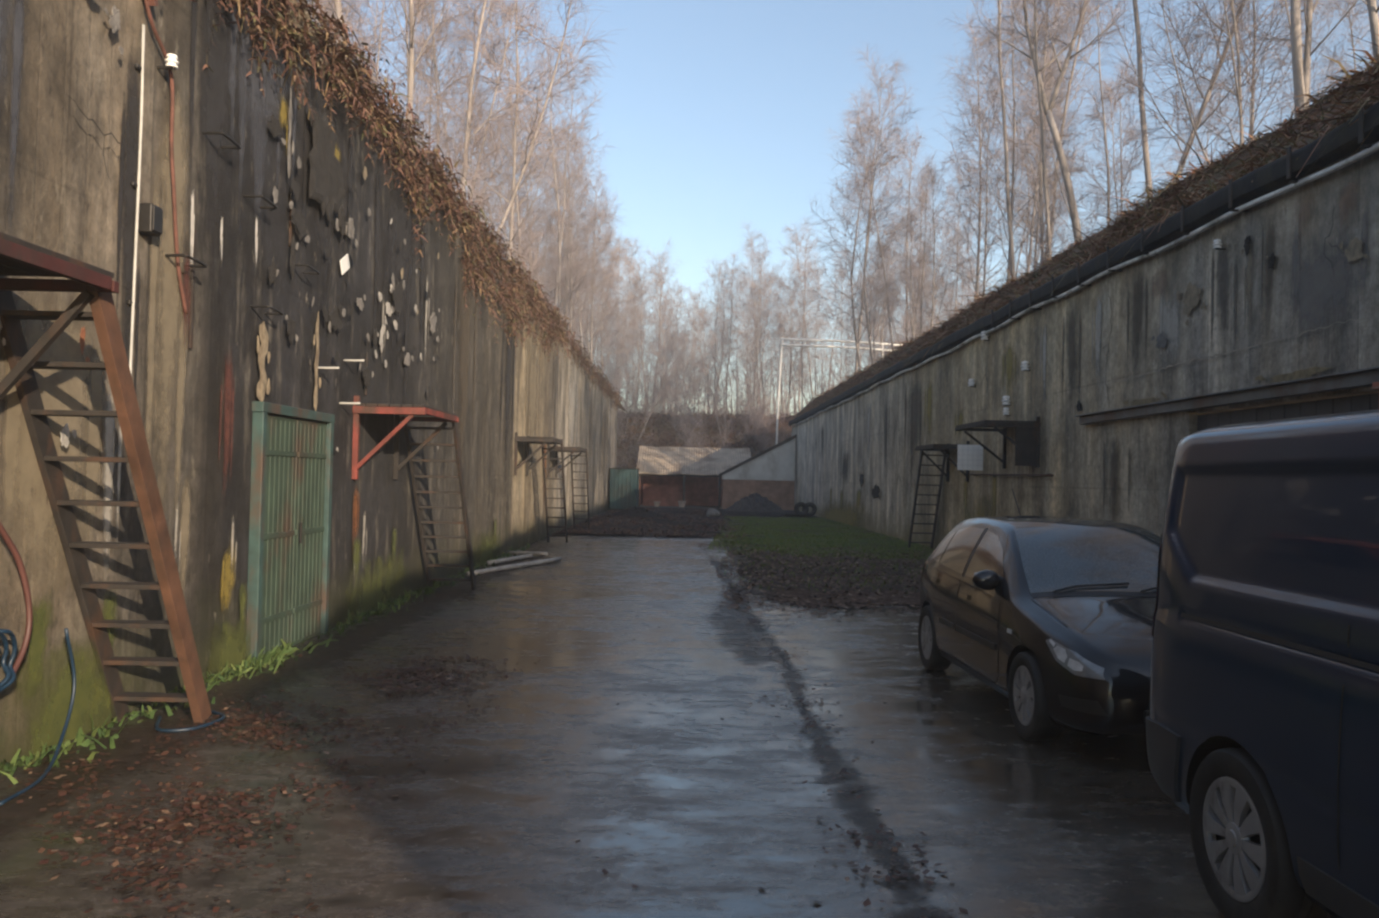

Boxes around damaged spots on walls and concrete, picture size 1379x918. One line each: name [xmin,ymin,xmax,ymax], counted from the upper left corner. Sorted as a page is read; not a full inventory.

spalling [336,208,371,262]
peeling [257,321,270,401]
peeling [285,268,440,411]
water stain [1040,300,1102,387]
water stain [1127,277,1179,356]
water stain [1211,229,1274,333]